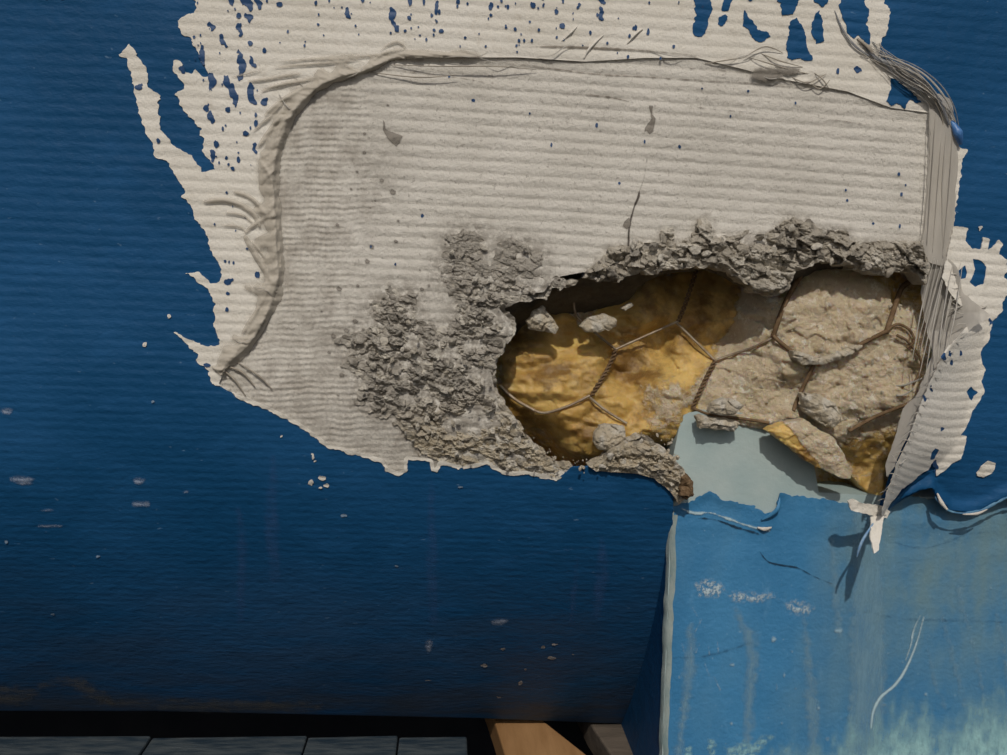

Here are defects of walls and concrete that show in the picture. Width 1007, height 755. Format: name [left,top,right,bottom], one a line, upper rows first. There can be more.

spalling [119,0,931,534]
peeling [976,461,996,477]